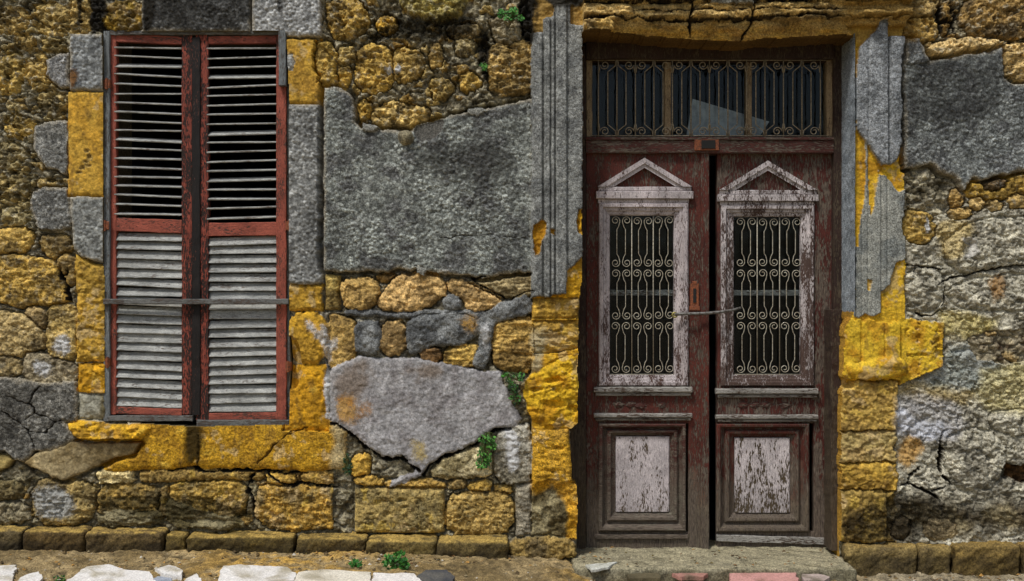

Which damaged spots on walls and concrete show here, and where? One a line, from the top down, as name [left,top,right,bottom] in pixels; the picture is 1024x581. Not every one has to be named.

spalling [315,0,555,132]
crack [687,1,695,38]
crack [740,1,756,42]
spalling [847,0,1024,85]
spalling [855,120,1024,247]
peeling [533,220,556,256]
spalling [322,258,582,378]
peeling [852,260,906,318]
crack [2,387,63,448]
crack [169,427,339,513]
spalling [330,412,578,559]
crack [898,434,954,503]